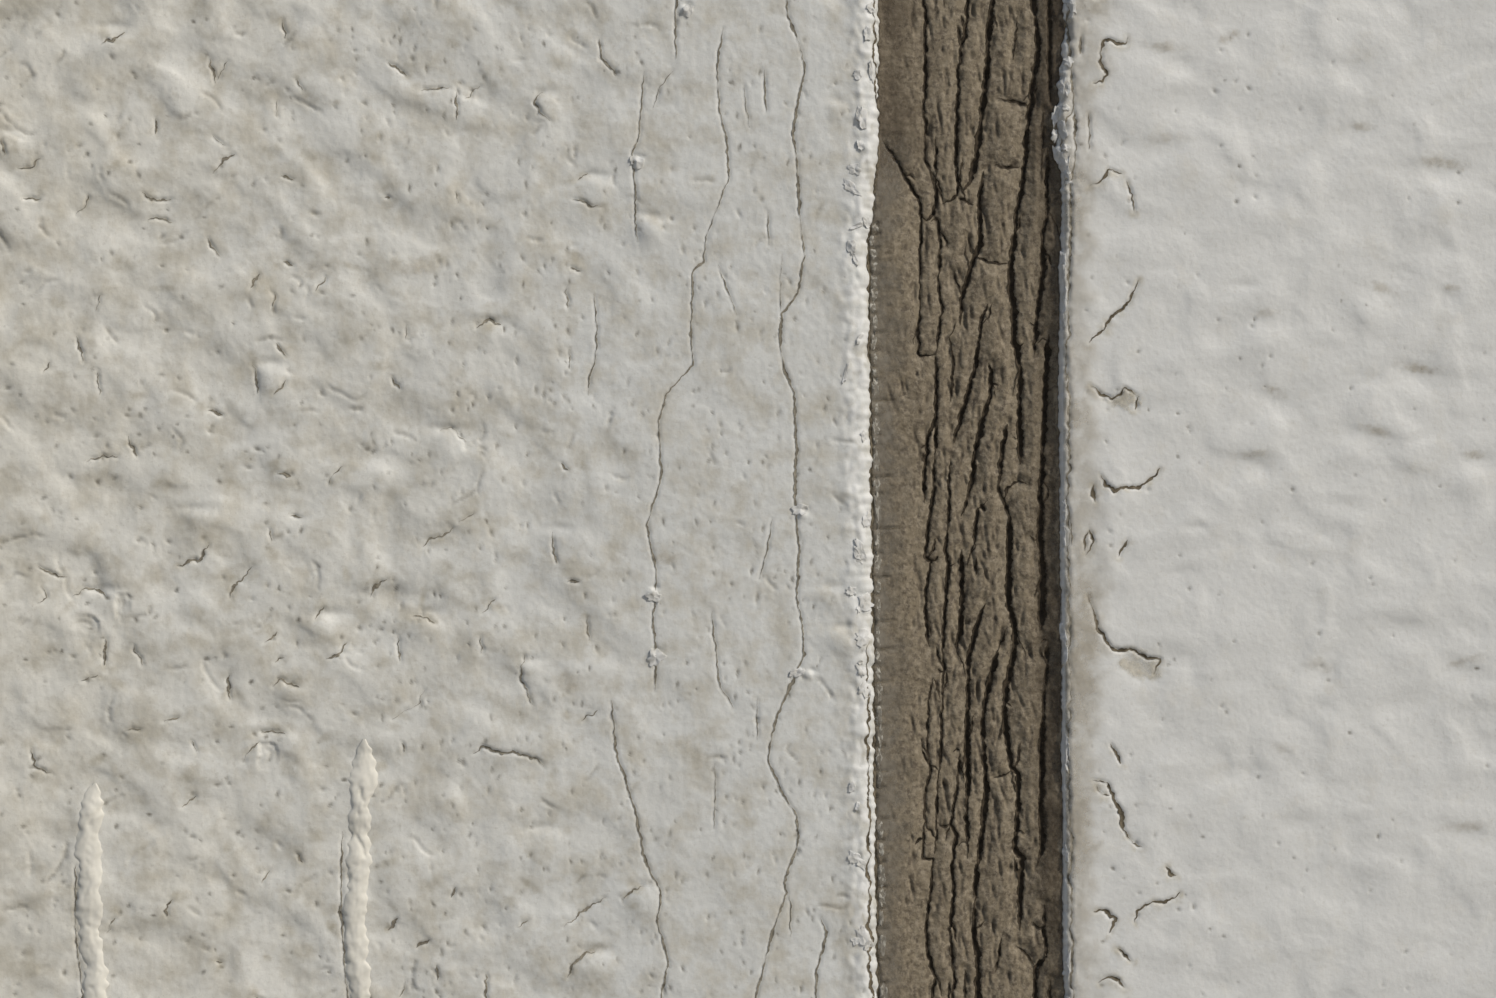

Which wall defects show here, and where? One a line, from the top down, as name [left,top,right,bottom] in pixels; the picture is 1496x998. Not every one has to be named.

crack [573,0,678,240]
crack [565,267,598,388]
crack [646,1,828,998]
crack [864,0,1180,998]
crack [566,701,669,998]